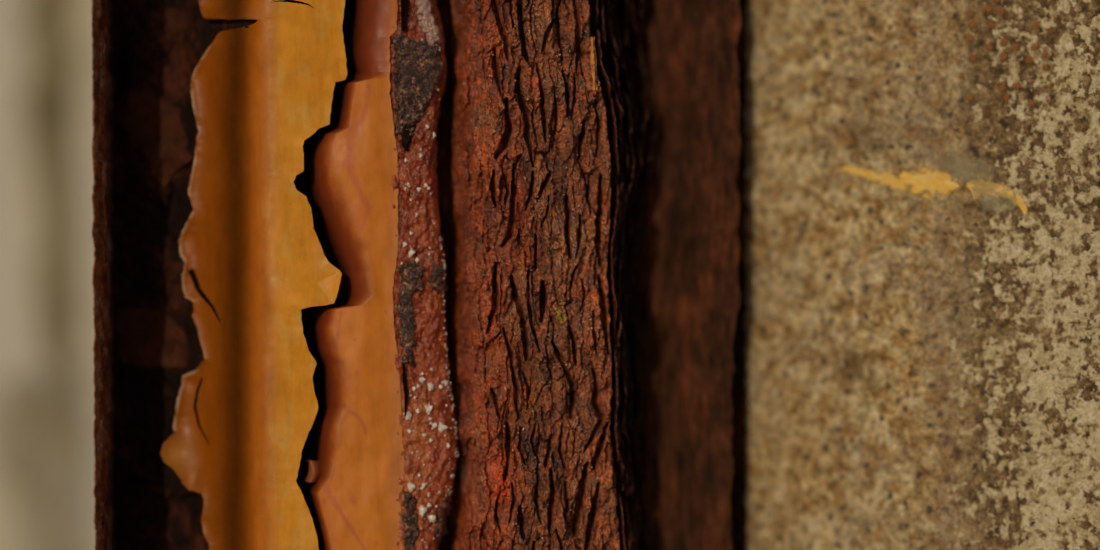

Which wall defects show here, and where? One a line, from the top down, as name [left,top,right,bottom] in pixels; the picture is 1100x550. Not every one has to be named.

peeling [160,0,658,550]